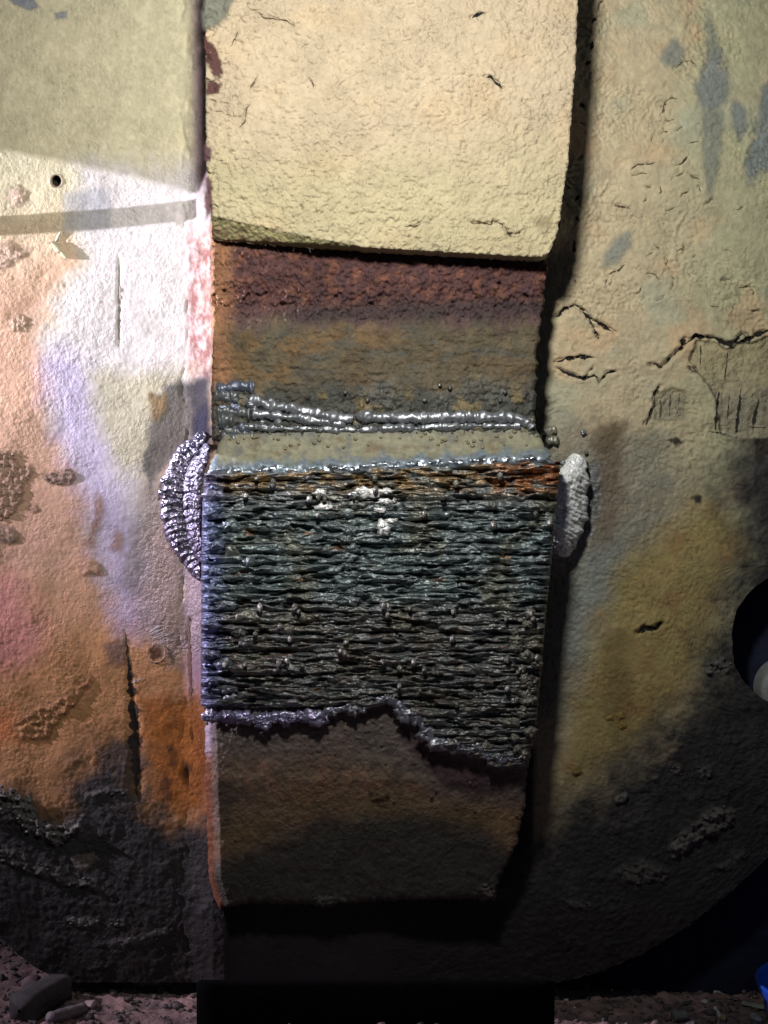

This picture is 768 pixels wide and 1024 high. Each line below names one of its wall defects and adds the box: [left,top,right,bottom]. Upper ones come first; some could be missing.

crack [554,304,616,382]
crack [645,330,768,425]